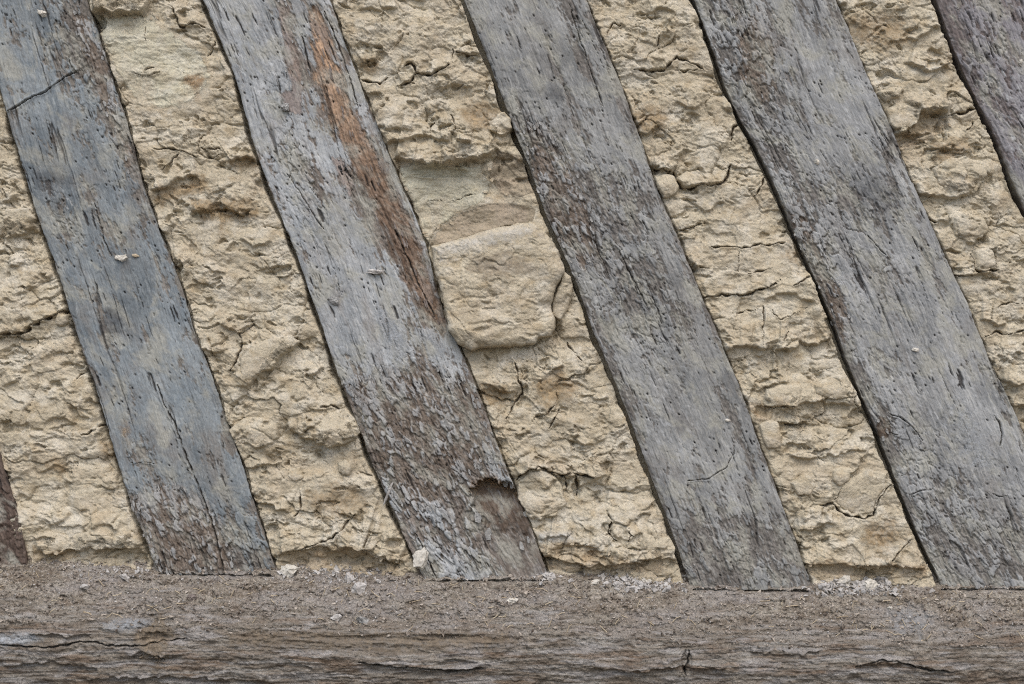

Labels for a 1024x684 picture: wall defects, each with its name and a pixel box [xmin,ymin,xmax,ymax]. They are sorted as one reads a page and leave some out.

crack [324,11,484,105]
crack [9,70,81,110]
crack [506,364,523,418]
crack [823,485,931,519]
peeling [475,512,492,540]